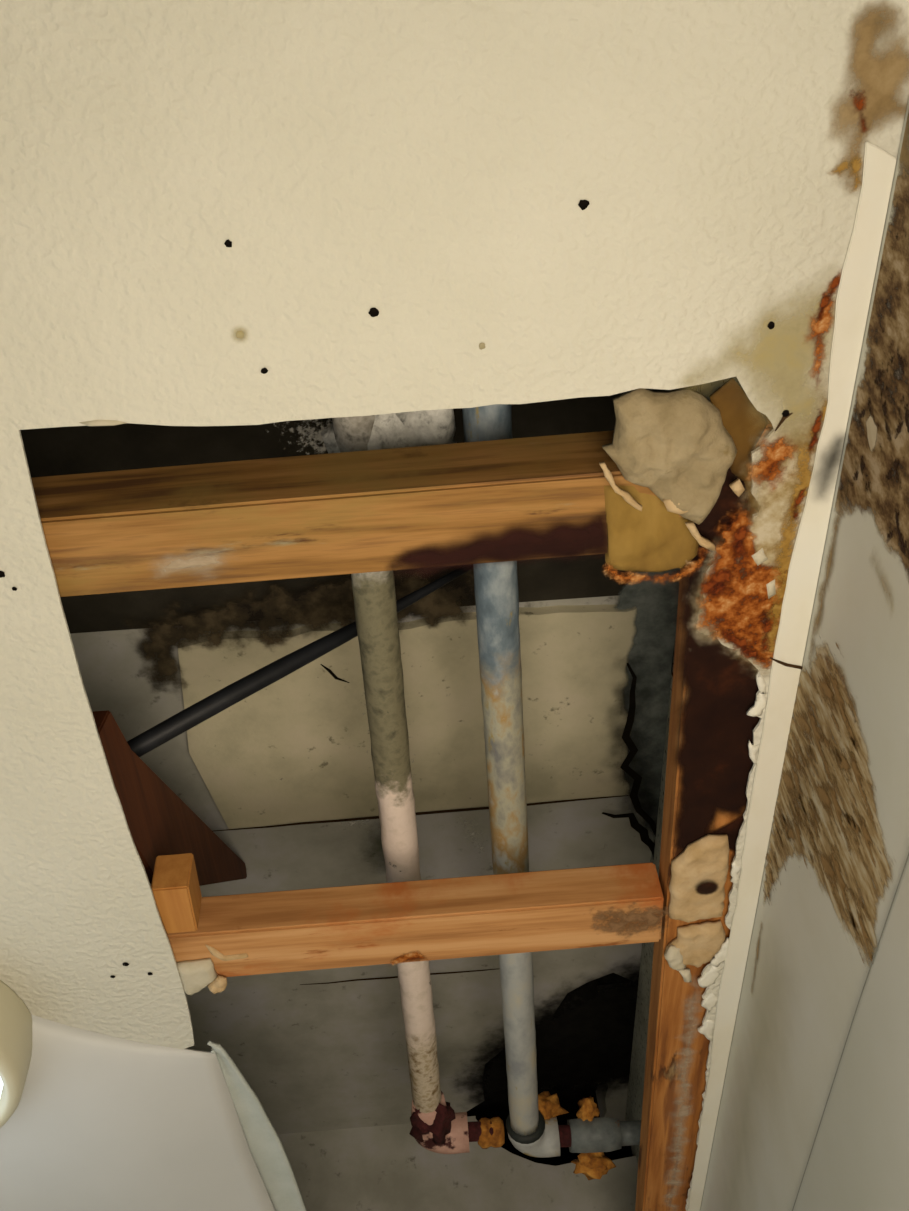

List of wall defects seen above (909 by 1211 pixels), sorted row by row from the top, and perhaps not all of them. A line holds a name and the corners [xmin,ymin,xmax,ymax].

flaking render [599,461,643,511]
rust [748,438,797,490]
water stain [391,516,720,584]
rust [696,511,783,668]
peeling [746,670,767,717]
crack [602,663,657,859]
peeling [748,740,759,765]
flaking render [207,975,227,994]
peeling [664,938,729,1042]
spalling [467,1099,581,1166]
spalling [556,1088,600,1125]
spalling [604,1146,632,1160]